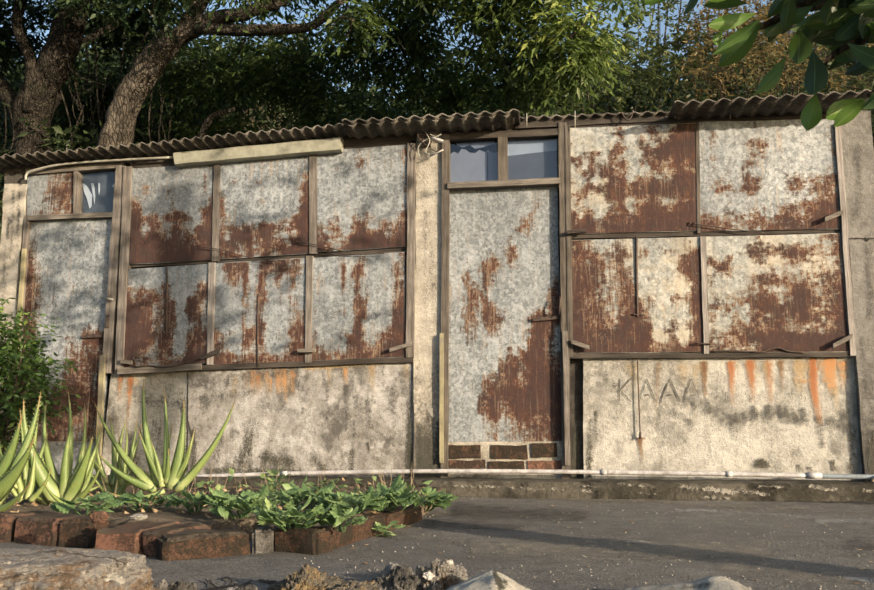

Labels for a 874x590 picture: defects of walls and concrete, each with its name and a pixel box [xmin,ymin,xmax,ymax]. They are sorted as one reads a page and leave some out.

rust [33,172,74,215]
rust [20,228,104,441]
rust [118,148,407,410]
rust [460,191,544,345]
rust [477,275,562,442]
rust [571,122,849,420]
damp [673,396,857,474]